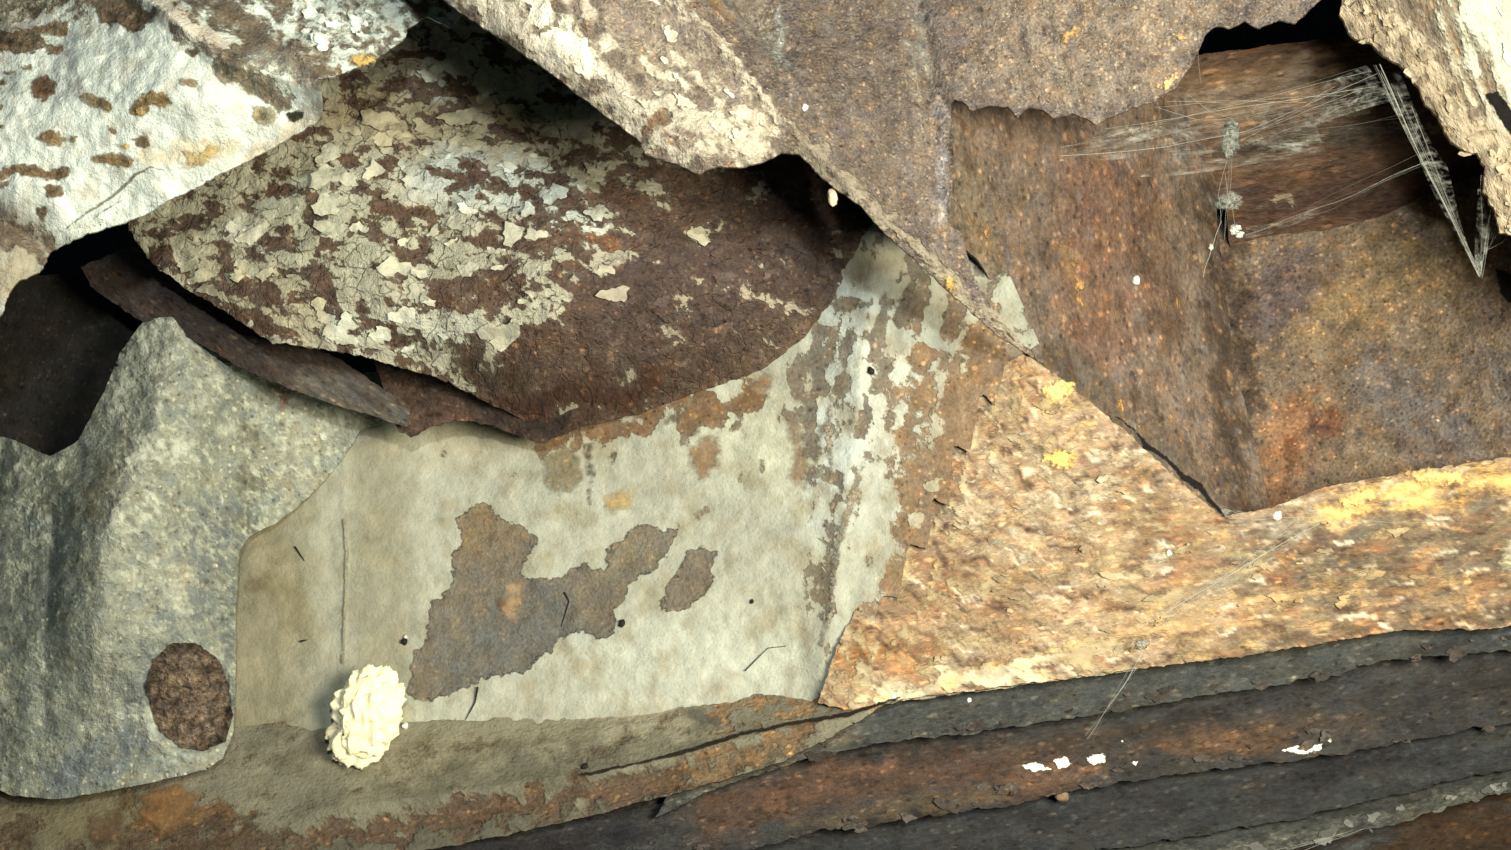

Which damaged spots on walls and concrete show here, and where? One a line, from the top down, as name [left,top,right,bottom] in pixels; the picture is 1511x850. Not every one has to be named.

peeling [297,0,377,52]
rust [350,53,377,67]
peeling [574,25,698,114]
peeling [177,90,525,296]
peeling [457,183,569,277]
peeling [311,238,436,352]
peeling [476,290,533,352]
peeling [592,264,633,302]
rust [818,354,1511,710]
peeling [406,502,718,702]
rust [90,783,197,846]
rust [1054,792,1069,802]